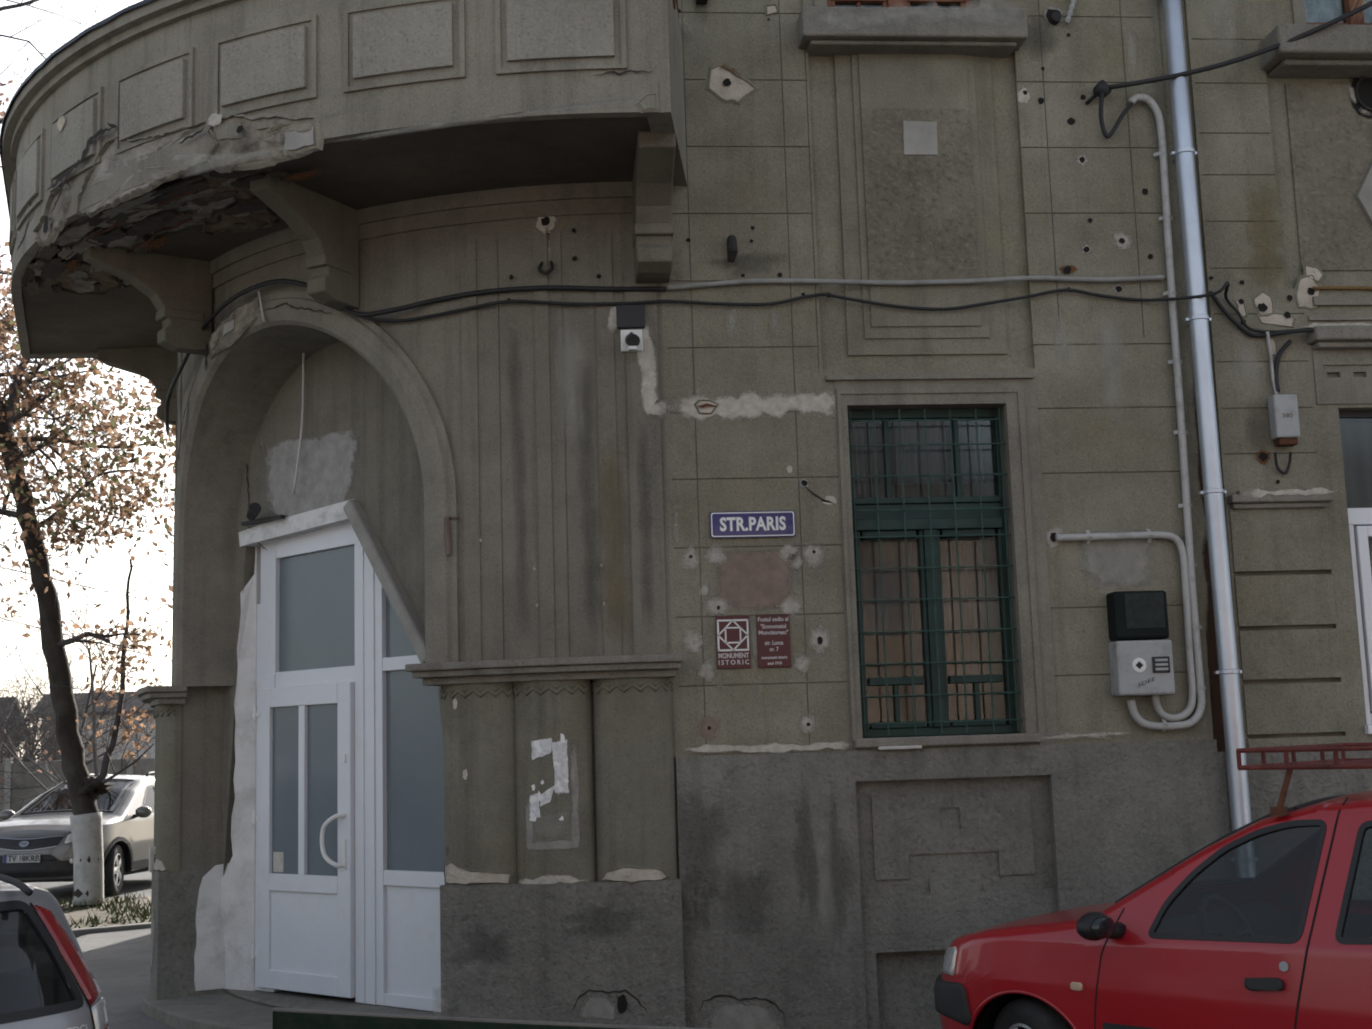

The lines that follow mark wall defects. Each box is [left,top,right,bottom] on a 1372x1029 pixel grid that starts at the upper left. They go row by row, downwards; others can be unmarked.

flaking render [705,63,760,106]
flaking render [21,112,324,296]
flaking render [1234,264,1372,357]
flaking render [694,399,719,415]
crack [570,989,647,1013]
crack [699,995,786,1026]
damp [711,1004,777,1029]